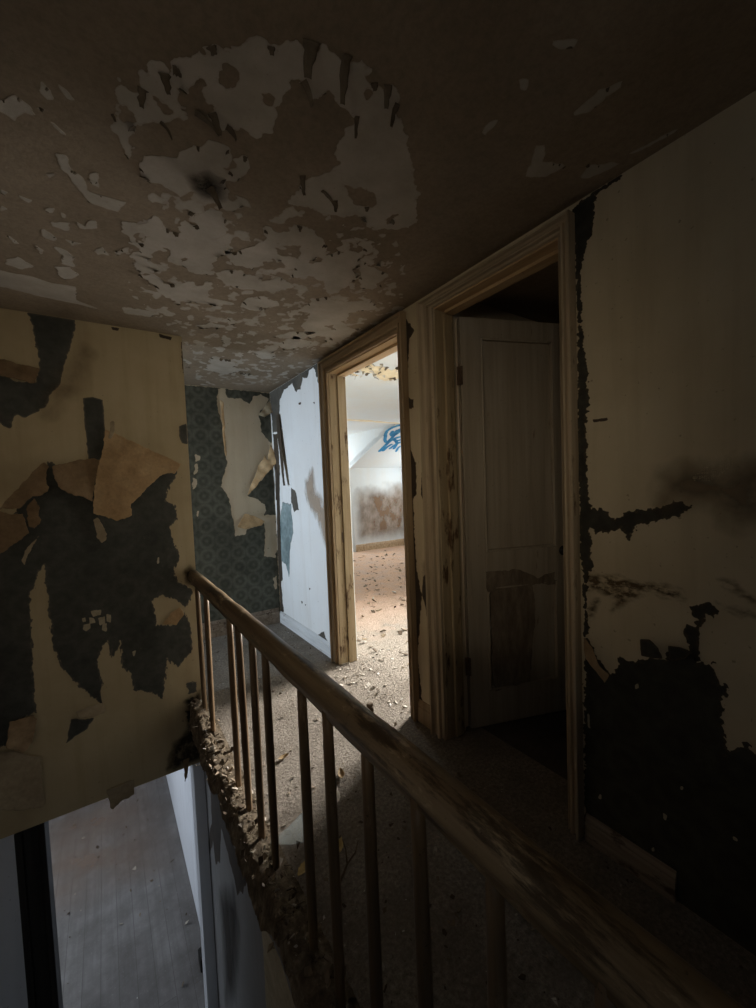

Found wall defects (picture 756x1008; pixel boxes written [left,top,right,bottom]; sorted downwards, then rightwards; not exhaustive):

peeling [0,81,74,121]
peeling [46,35,421,359]
peeling [0,207,97,309]
peeling [196,317,258,379]
peeling [350,364,398,381]
water stain [360,490,403,536]
peeling [209,793,246,895]